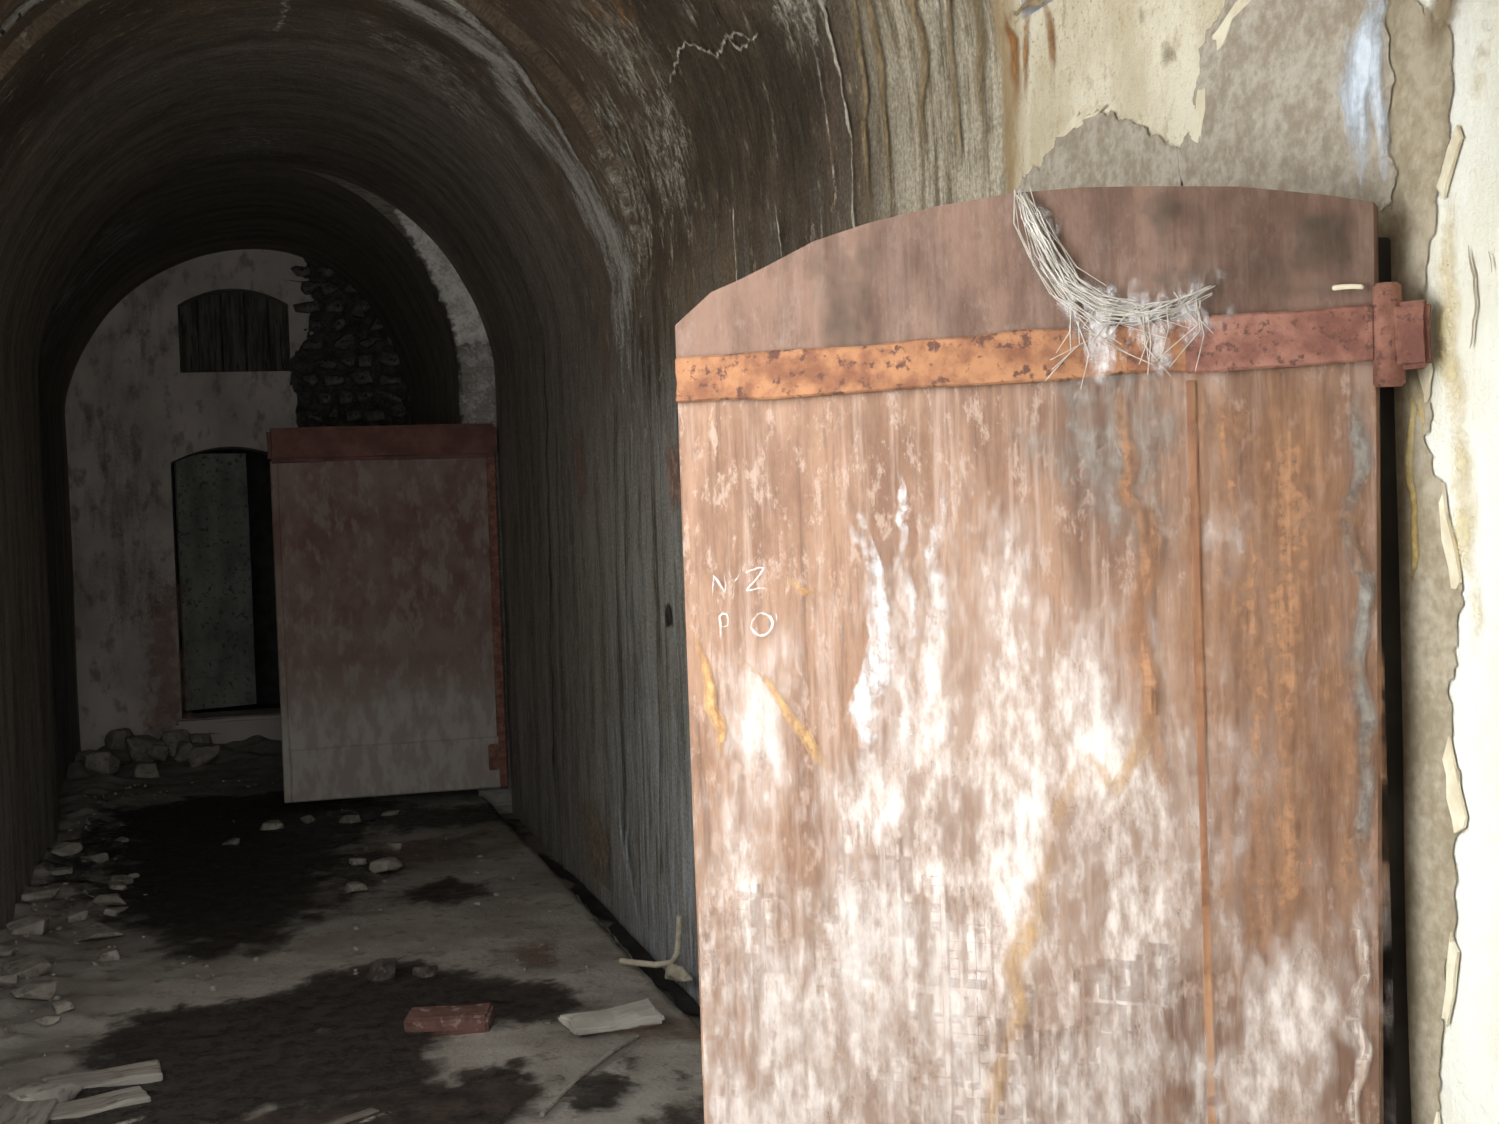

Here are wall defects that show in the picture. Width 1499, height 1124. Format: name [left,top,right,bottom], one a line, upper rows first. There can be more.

water stain [439,0,580,164]
water stain [638,0,889,228]
water stain [906,0,961,168]
water stain [974,0,984,133]
spalling [1016,0,1464,302]
peeling [1394,363,1468,1124]
water stain [29,791,533,960]
water stain [47,959,640,1124]
water stain [639,1096,704,1124]
peeling [1234,902,1372,1124]